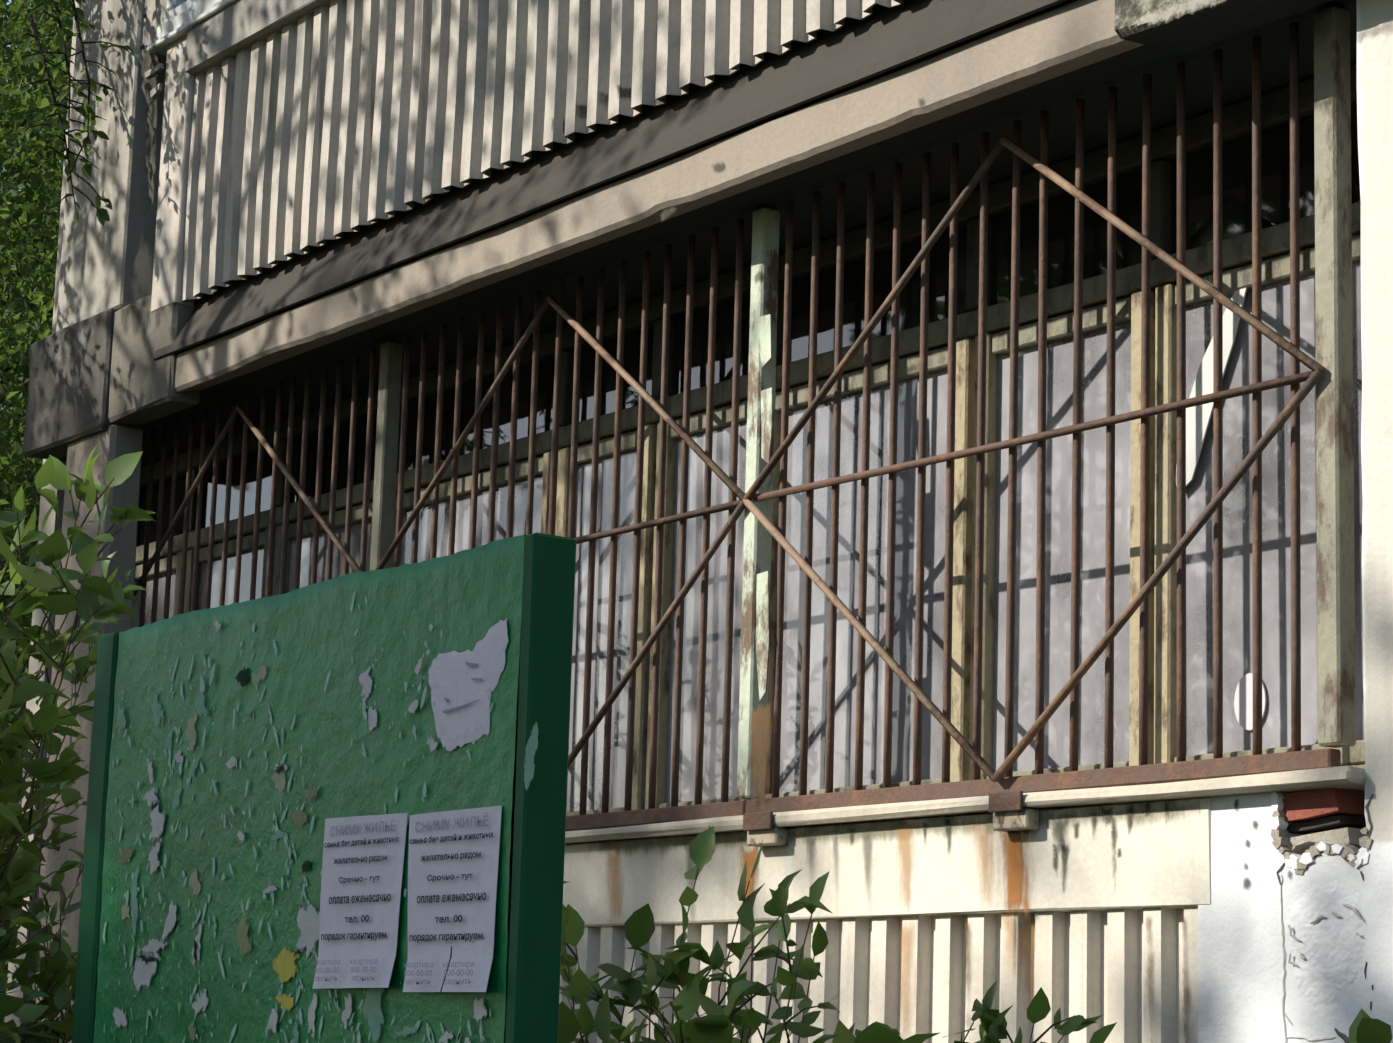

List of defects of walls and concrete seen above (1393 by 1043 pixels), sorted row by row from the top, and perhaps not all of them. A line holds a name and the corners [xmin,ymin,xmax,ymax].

peeling [755,314,772,368]
peeling [761,387,773,463]
peeling [756,571,770,701]
corrosion [750,706,770,800]
leakage [600,836,696,870]
leakage [715,832,747,845]
leakage [792,816,993,870]
corrosion [900,831,909,889]
corrosion [982,831,1032,958]
leakage [1039,802,1184,885]
spalling [1267,788,1374,885]
crack [1280,875,1349,1043]